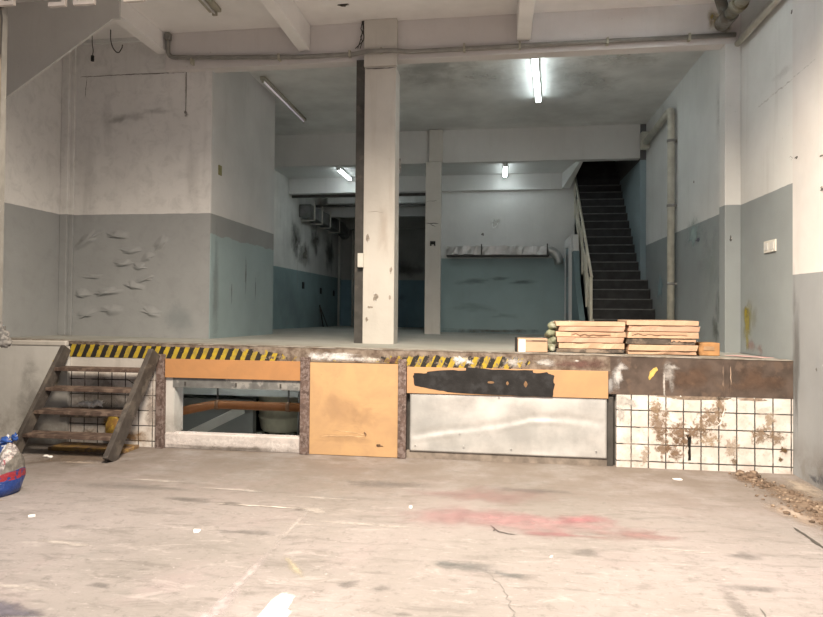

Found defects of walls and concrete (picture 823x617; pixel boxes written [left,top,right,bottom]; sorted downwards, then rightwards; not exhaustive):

crack [794,528,823,548]